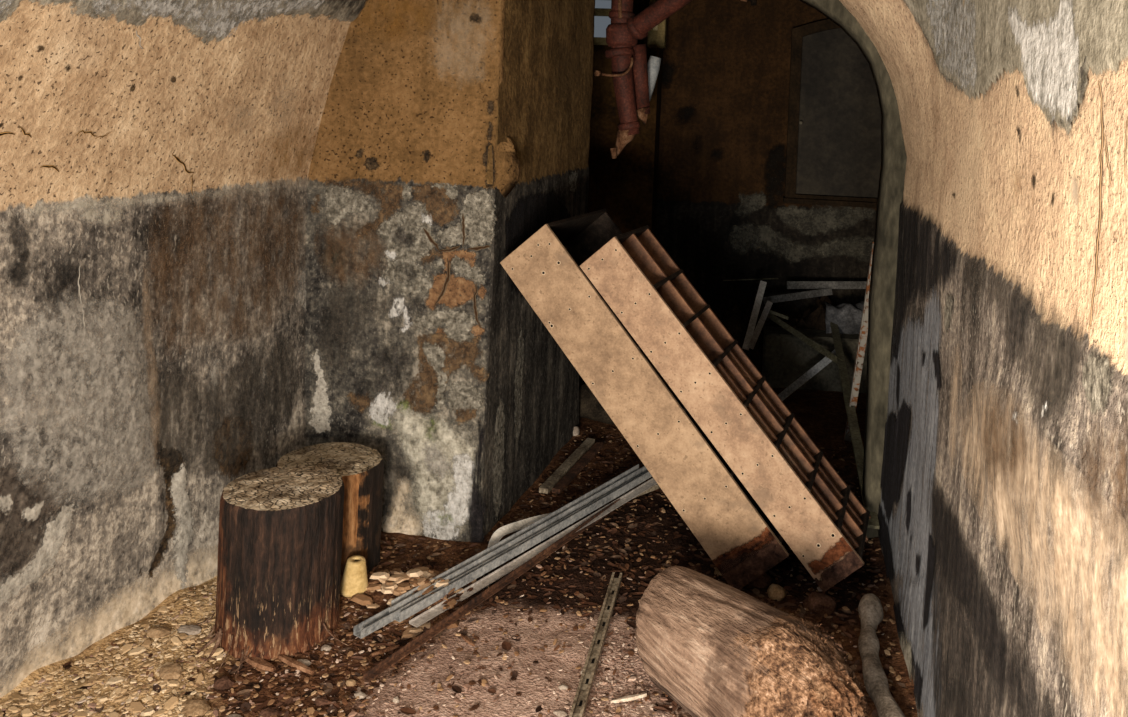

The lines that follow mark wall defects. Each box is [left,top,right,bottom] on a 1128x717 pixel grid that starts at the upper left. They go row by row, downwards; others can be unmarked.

peeling [94,0,324,37]
peeling [926,0,977,90]
peeling [1008,0,1079,120]
water stain [8,222,79,304]
peeling [310,101,497,447]
water stain [28,425,68,475]
water stain [158,336,295,474]
efflorescence [309,349,332,433]
water stain [382,330,524,543]
water stain [878,200,1128,717]
water stain [0,552,218,698]
water stain [814,551,864,593]